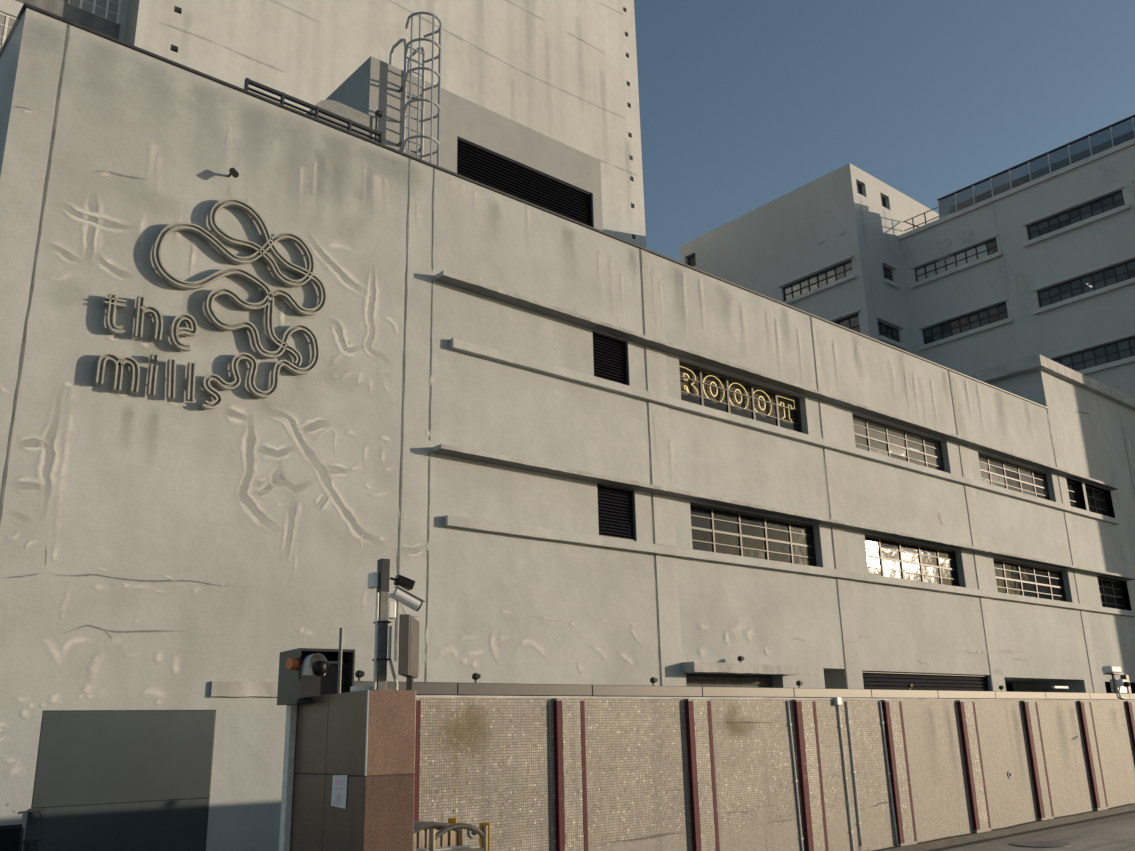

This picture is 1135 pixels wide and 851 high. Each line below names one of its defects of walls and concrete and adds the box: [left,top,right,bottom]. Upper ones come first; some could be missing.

crack [82,574,210,585]